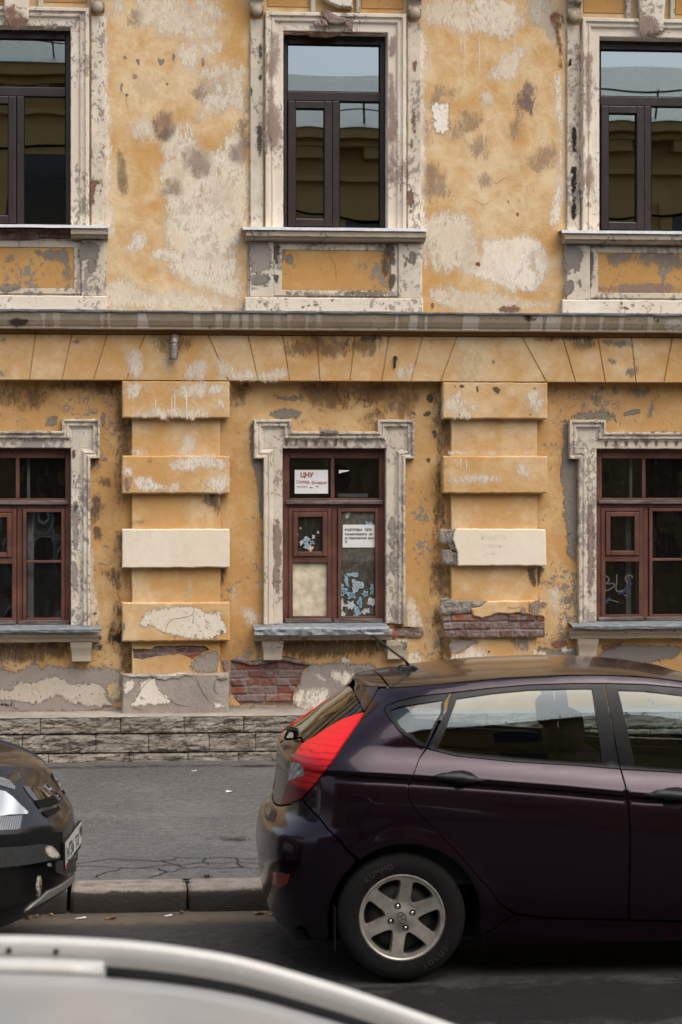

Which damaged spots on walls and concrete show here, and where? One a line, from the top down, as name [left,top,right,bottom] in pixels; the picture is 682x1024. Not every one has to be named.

leakage [513,82,537,115]
peeling [0,0,396,311]
peeling [403,0,584,313]
peeling [123,365,302,421]
peeling [122,433,230,493]
peeling [559,408,640,593]
peeling [69,500,99,623]
flaking render [439,529,457,566]
flaking render [0,605,376,712]
flaking render [440,586,577,659]
peeling [599,641,682,663]